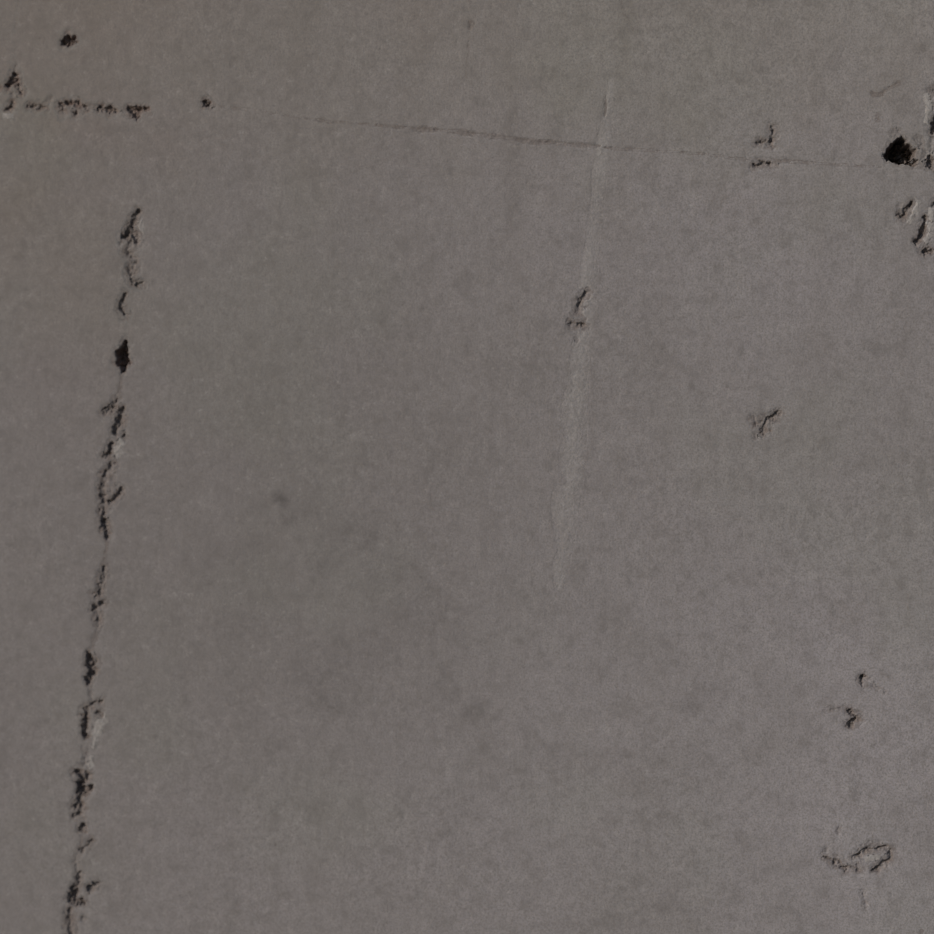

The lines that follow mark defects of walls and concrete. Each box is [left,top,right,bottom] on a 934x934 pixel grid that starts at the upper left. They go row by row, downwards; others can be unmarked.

crack [24,95,153,124]
crack [199,94,750,162]
crack [60,204,149,934]